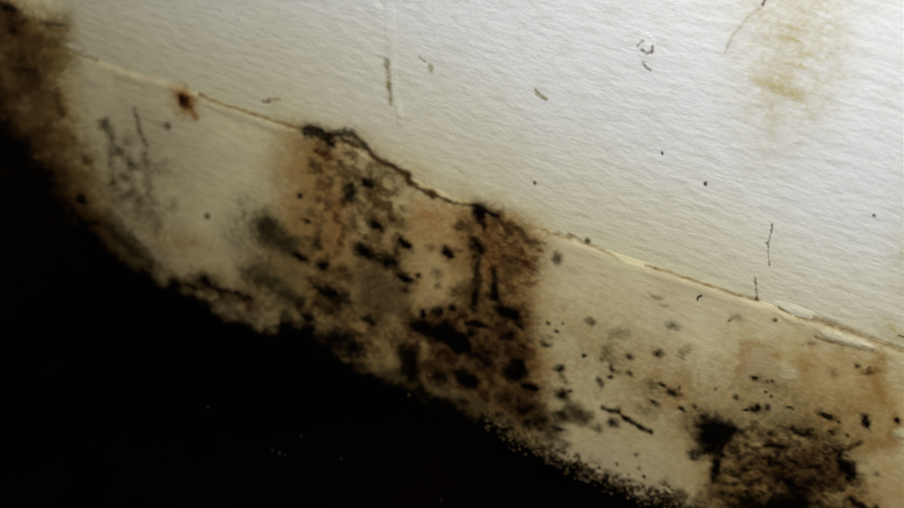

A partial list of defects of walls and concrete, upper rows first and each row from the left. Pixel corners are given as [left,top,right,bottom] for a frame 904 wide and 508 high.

corrosion [176,88,198,120]
damp [0,0,705,508]
damp [674,341,904,508]